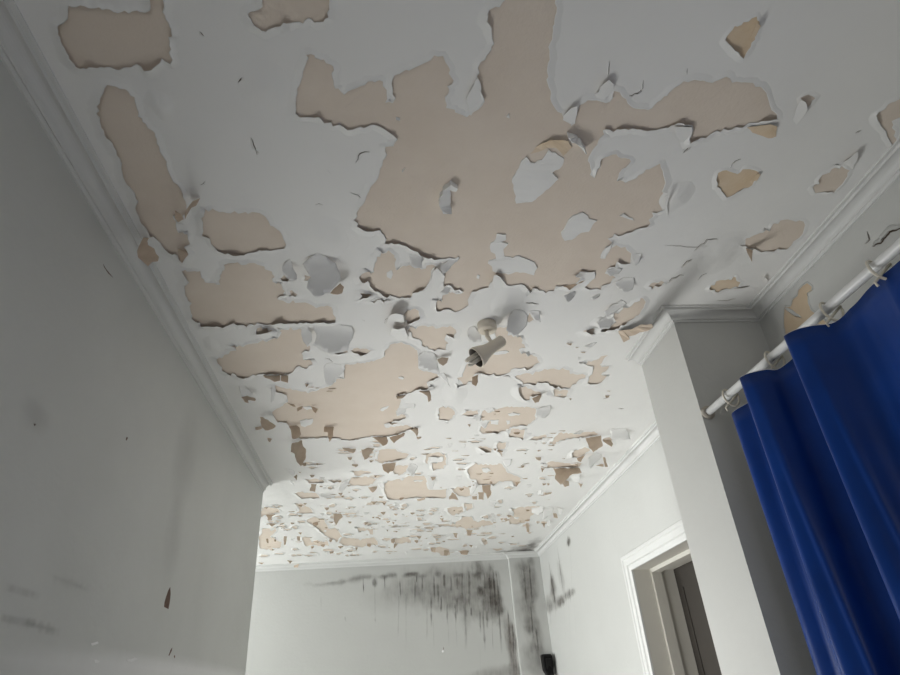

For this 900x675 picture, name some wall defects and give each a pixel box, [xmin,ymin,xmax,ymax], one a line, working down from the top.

peeling [868,95,900,149]
peeling [807,152,858,196]
peeling [46,0,827,568]
water stain [479,574,502,611]